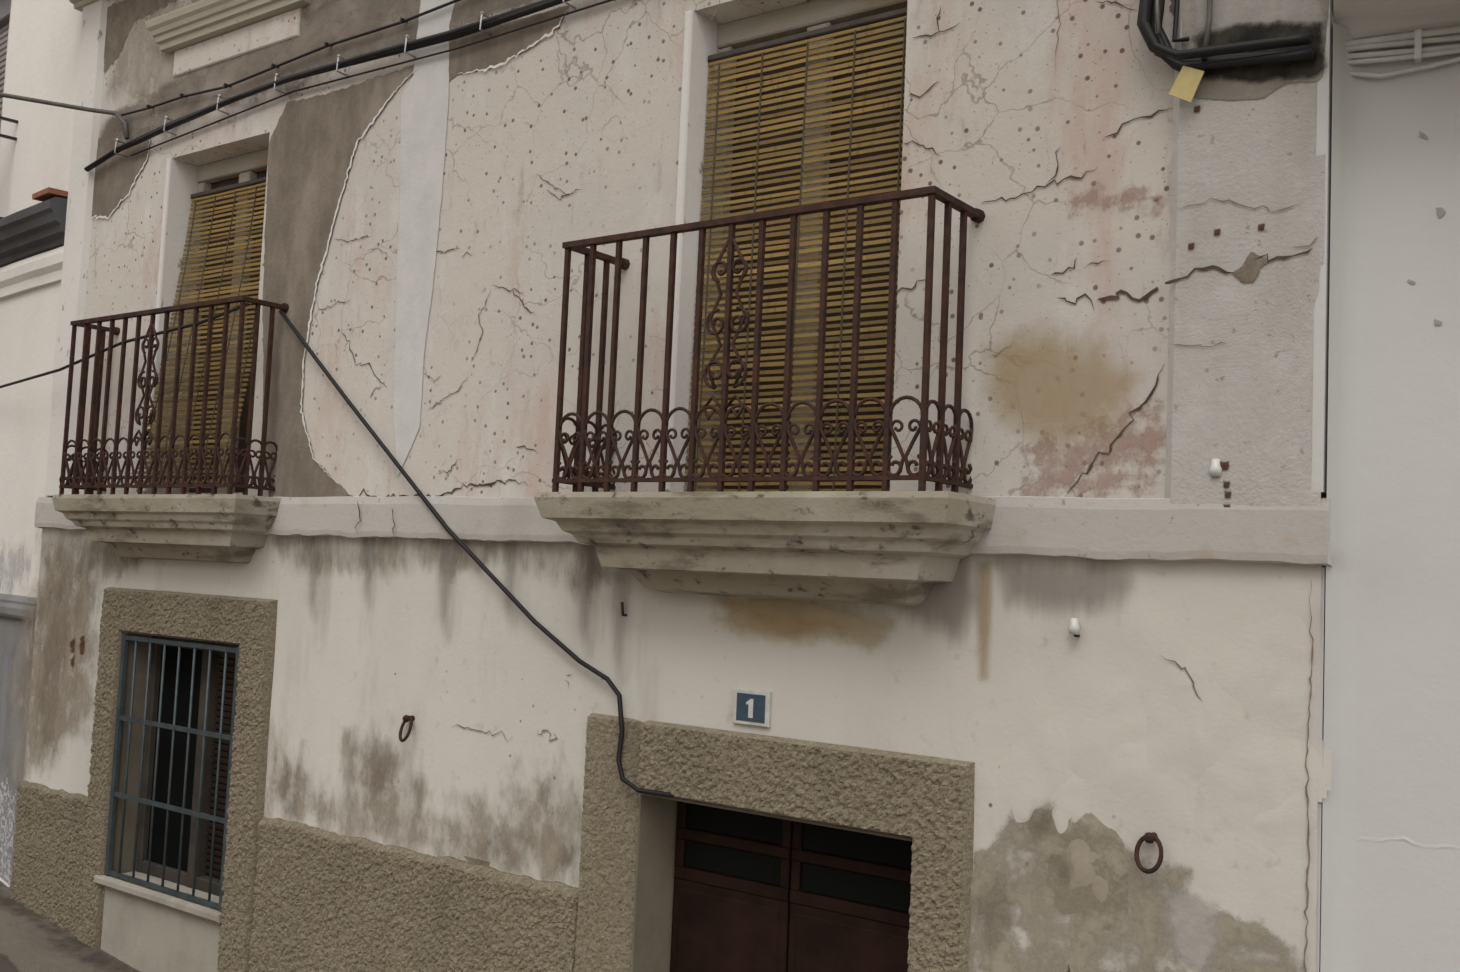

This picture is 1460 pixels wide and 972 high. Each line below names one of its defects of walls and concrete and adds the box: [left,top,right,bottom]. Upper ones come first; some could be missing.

crack [914,6,960,38]
crack [1054,0,1062,67]
crack [981,107,1173,204]
water stain [272,754,581,880]